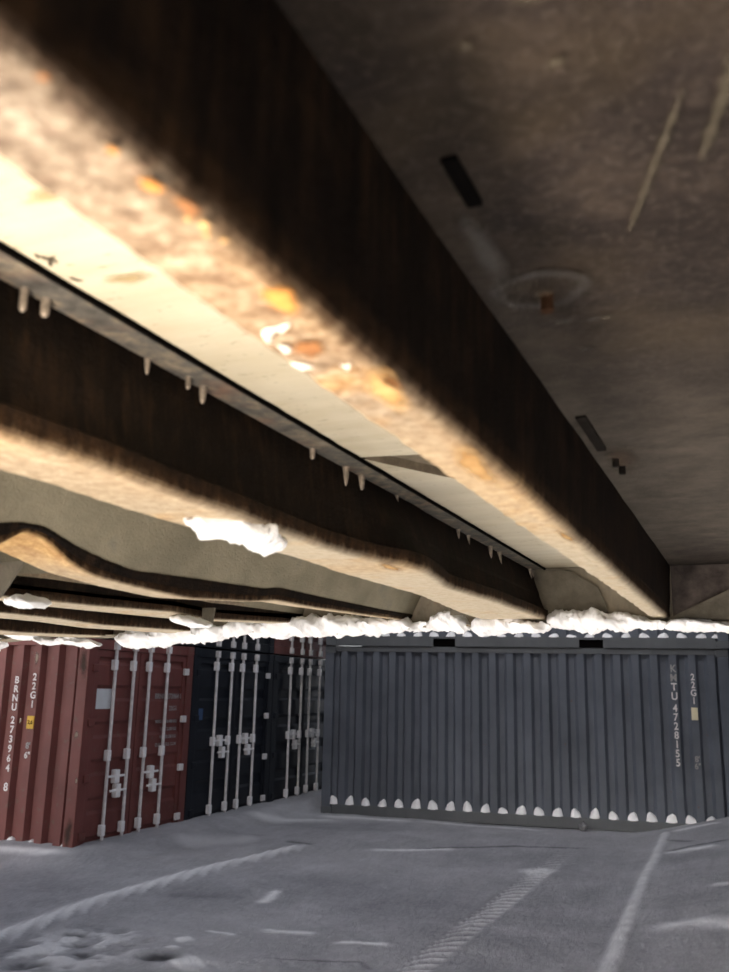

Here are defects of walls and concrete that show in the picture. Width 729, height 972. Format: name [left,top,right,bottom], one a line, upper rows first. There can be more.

corrosion [140,179,164,193]
corrosion [175,198,227,242]
corrosion [263,289,298,313]
corrosion [292,341,324,358]
corrosion [369,373,403,409]
corrosion [459,448,493,481]